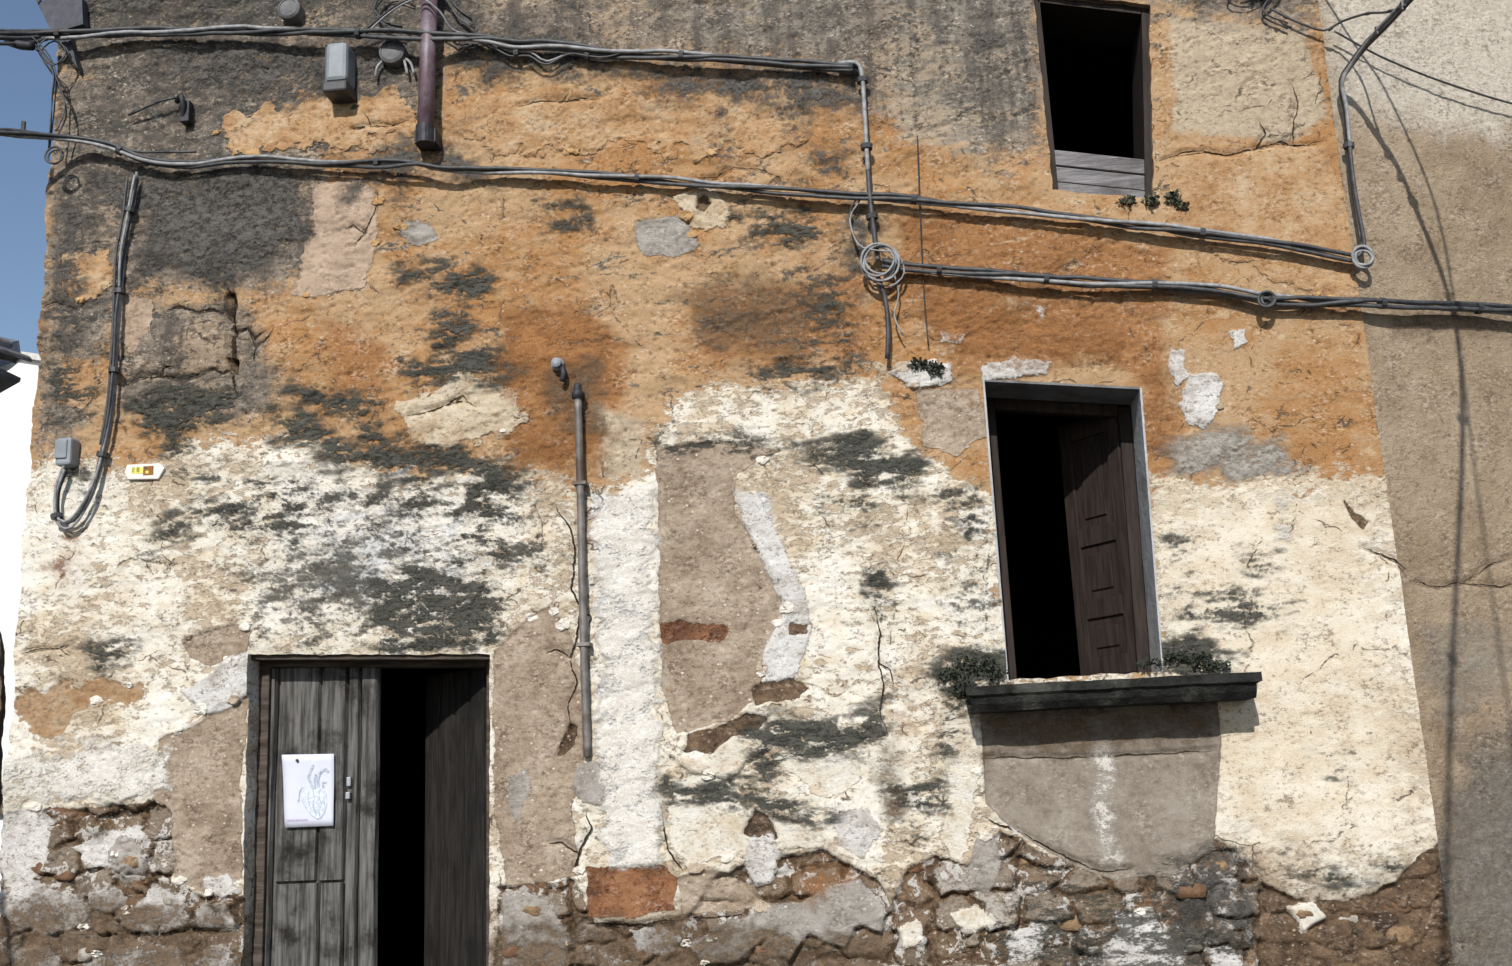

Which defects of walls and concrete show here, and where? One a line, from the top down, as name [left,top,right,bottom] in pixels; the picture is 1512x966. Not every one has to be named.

water stain [85,0,419,135]
water stain [342,138,484,205]
water stain [438,0,862,158]
water stain [809,149,854,174]
crack [1159,85,1323,161]
crack [125,287,272,392]
water stain [117,373,572,654]
crack [546,506,592,732]
water stain [650,427,1010,757]
crack [1364,548,1512,588]
peeling [492,440,1452,966]
peeling [0,623,252,966]